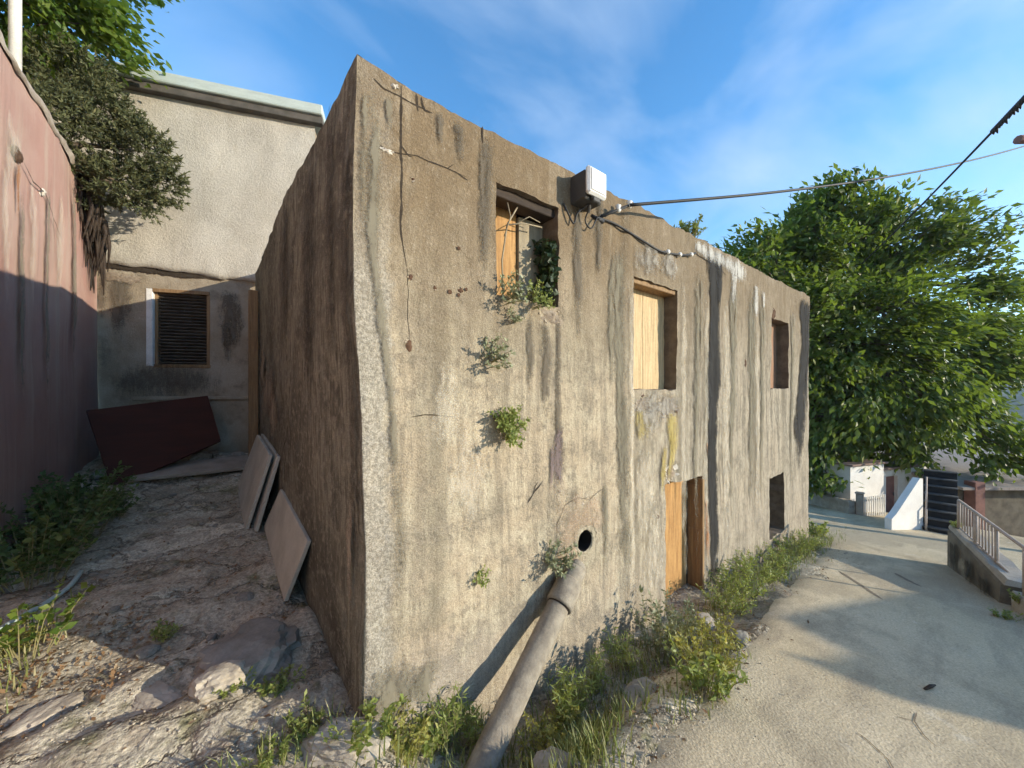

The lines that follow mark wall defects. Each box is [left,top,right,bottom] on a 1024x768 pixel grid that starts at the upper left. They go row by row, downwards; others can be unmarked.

damp [360,96,398,465]
crack [374,79,467,339]
damp [527,320,564,486]
damp [596,201,632,563]
peeling [634,393,680,430]
damp [694,252,766,578]
damp [790,301,810,477]